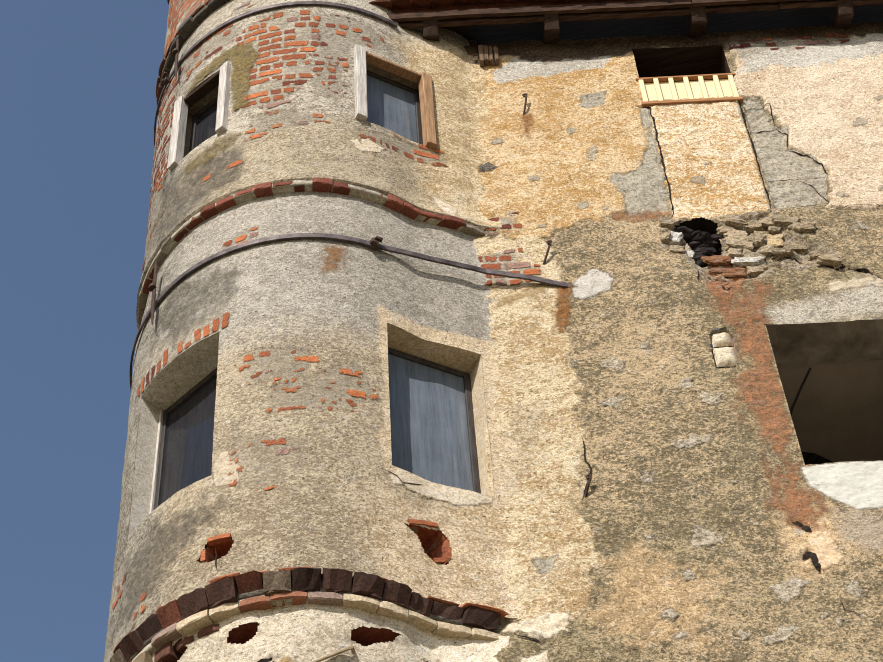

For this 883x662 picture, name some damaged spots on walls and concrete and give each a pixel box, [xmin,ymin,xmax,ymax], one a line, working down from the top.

spalling [142,0,386,271]
crack [735,100,883,212]
spalling [610,96,849,288]
crack [820,264,882,279]
spalling [828,277,883,292]
corrosion [706,259,826,529]
crack [790,368,812,417]
crack [580,438,592,499]
spalling [227,622,260,644]
spalling [351,626,401,646]